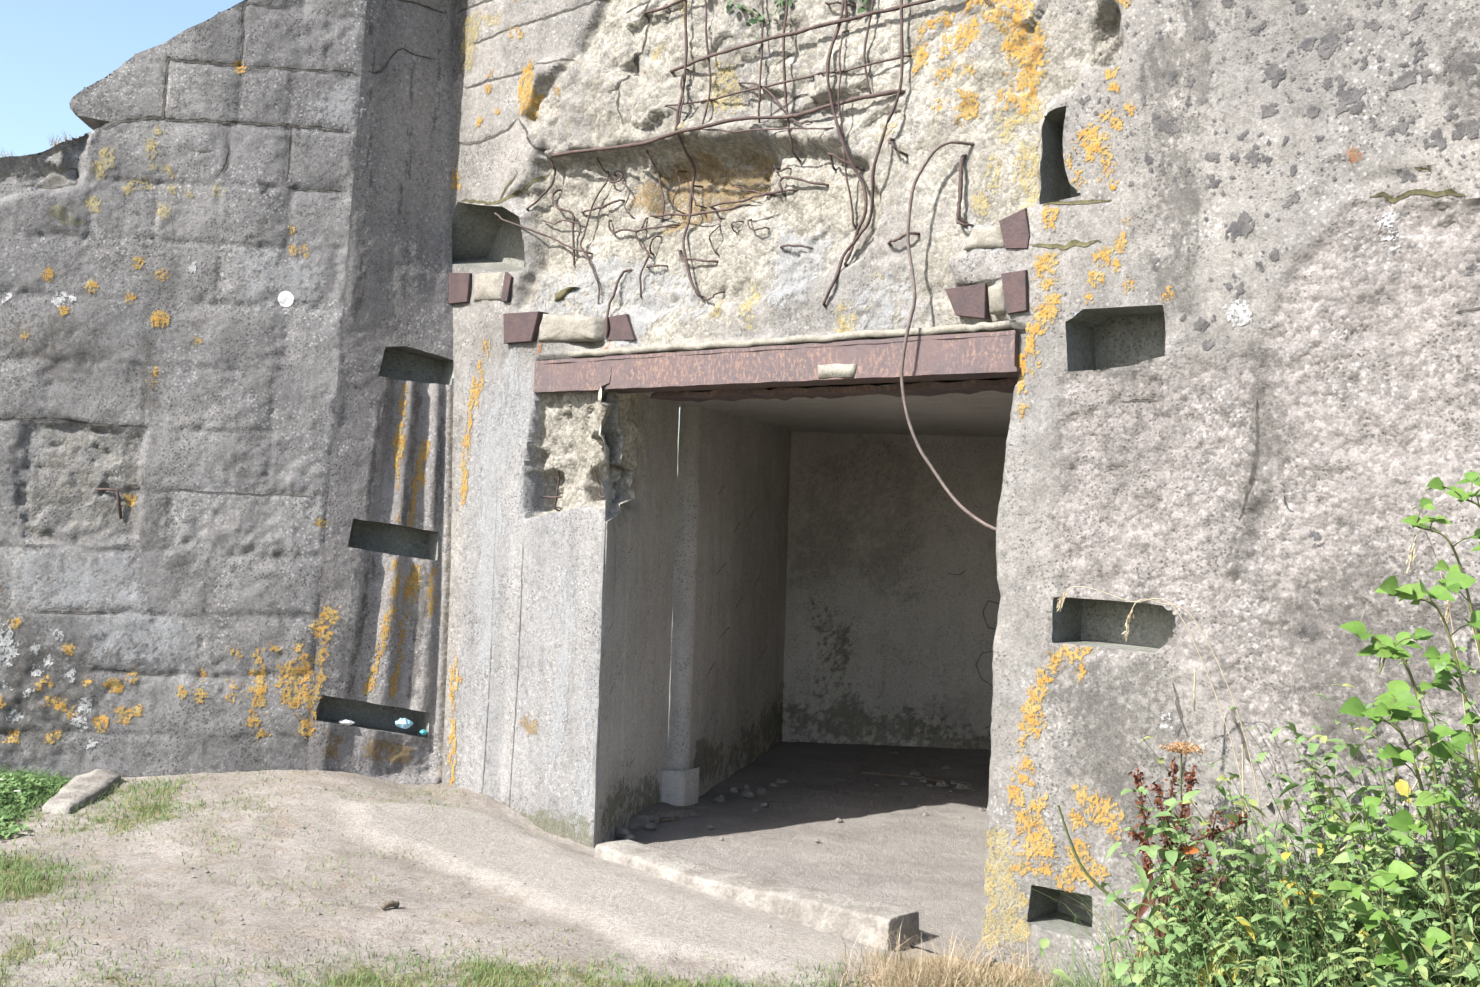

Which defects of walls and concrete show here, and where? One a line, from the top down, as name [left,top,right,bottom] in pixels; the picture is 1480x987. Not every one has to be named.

spalling [494,0,1136,350]
spalling [524,391,635,519]
crack [975,600,1000,688]